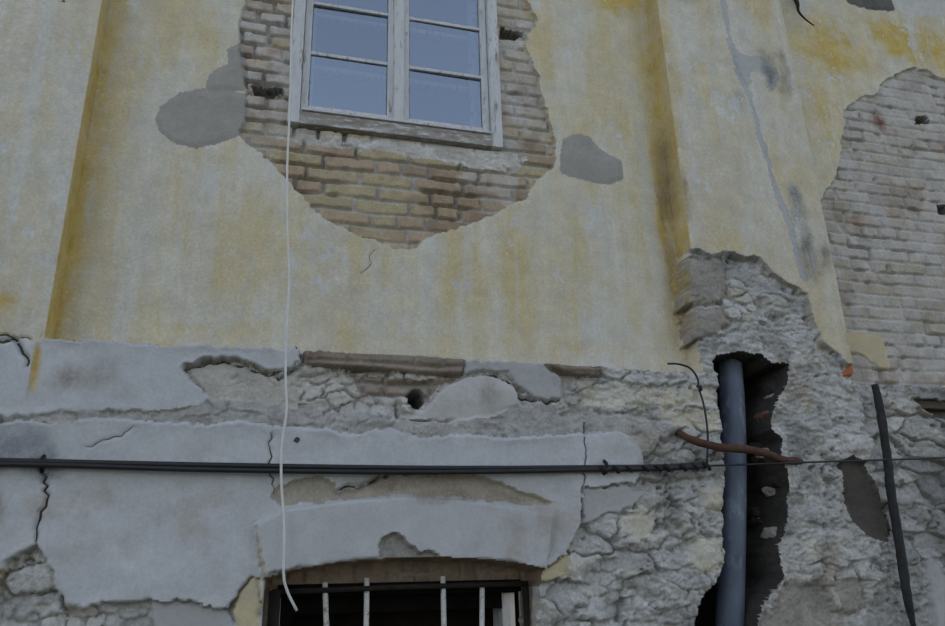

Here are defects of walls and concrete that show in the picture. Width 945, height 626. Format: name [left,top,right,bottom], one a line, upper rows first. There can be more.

flaking render [238,0,557,250]
crack [0,334,30,367]
flaking render [457,66,945,626]
flaking render [300,374,442,423]
crack [36,473,50,541]
flaking render [271,474,557,506]
flaking render [0,520,267,626]
flaking render [378,532,441,559]